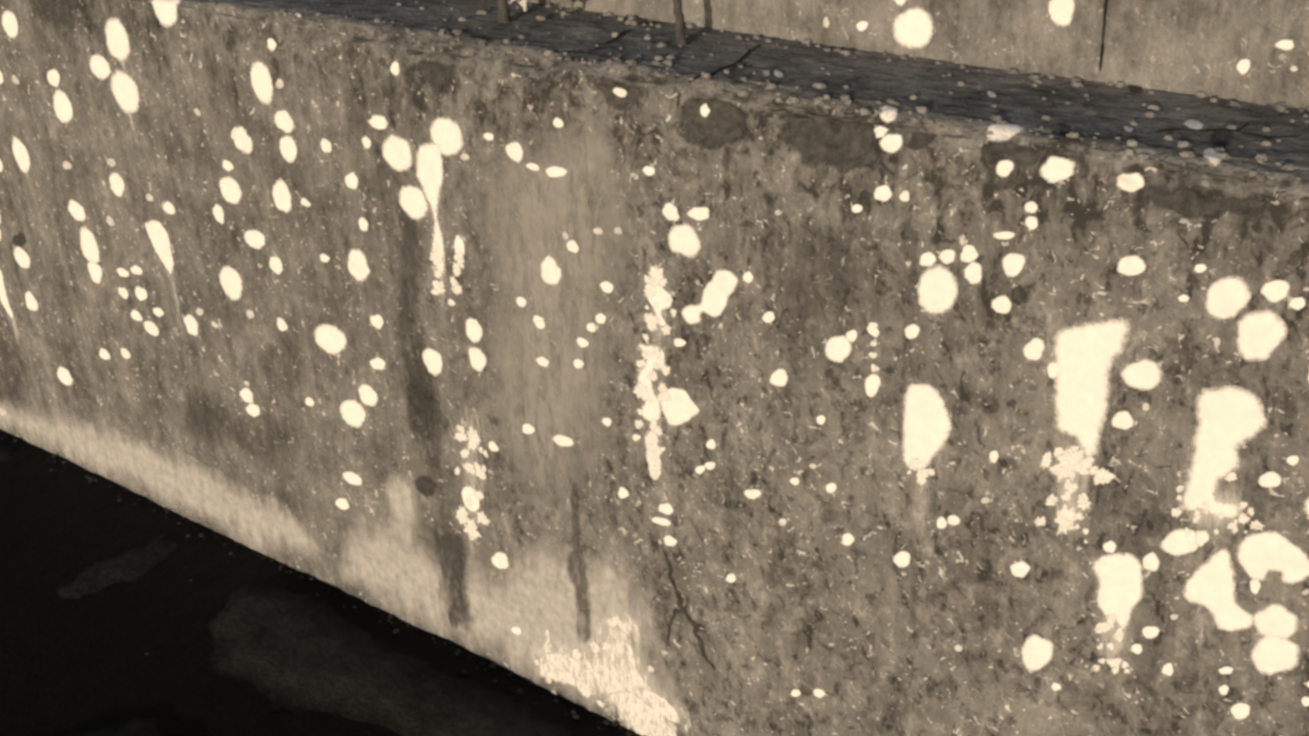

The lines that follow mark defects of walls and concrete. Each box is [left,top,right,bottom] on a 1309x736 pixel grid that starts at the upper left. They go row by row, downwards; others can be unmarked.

water stain [399,143,465,474]
water stain [485,130,622,490]
water stain [342,416,691,736]
crack [662,550,715,670]